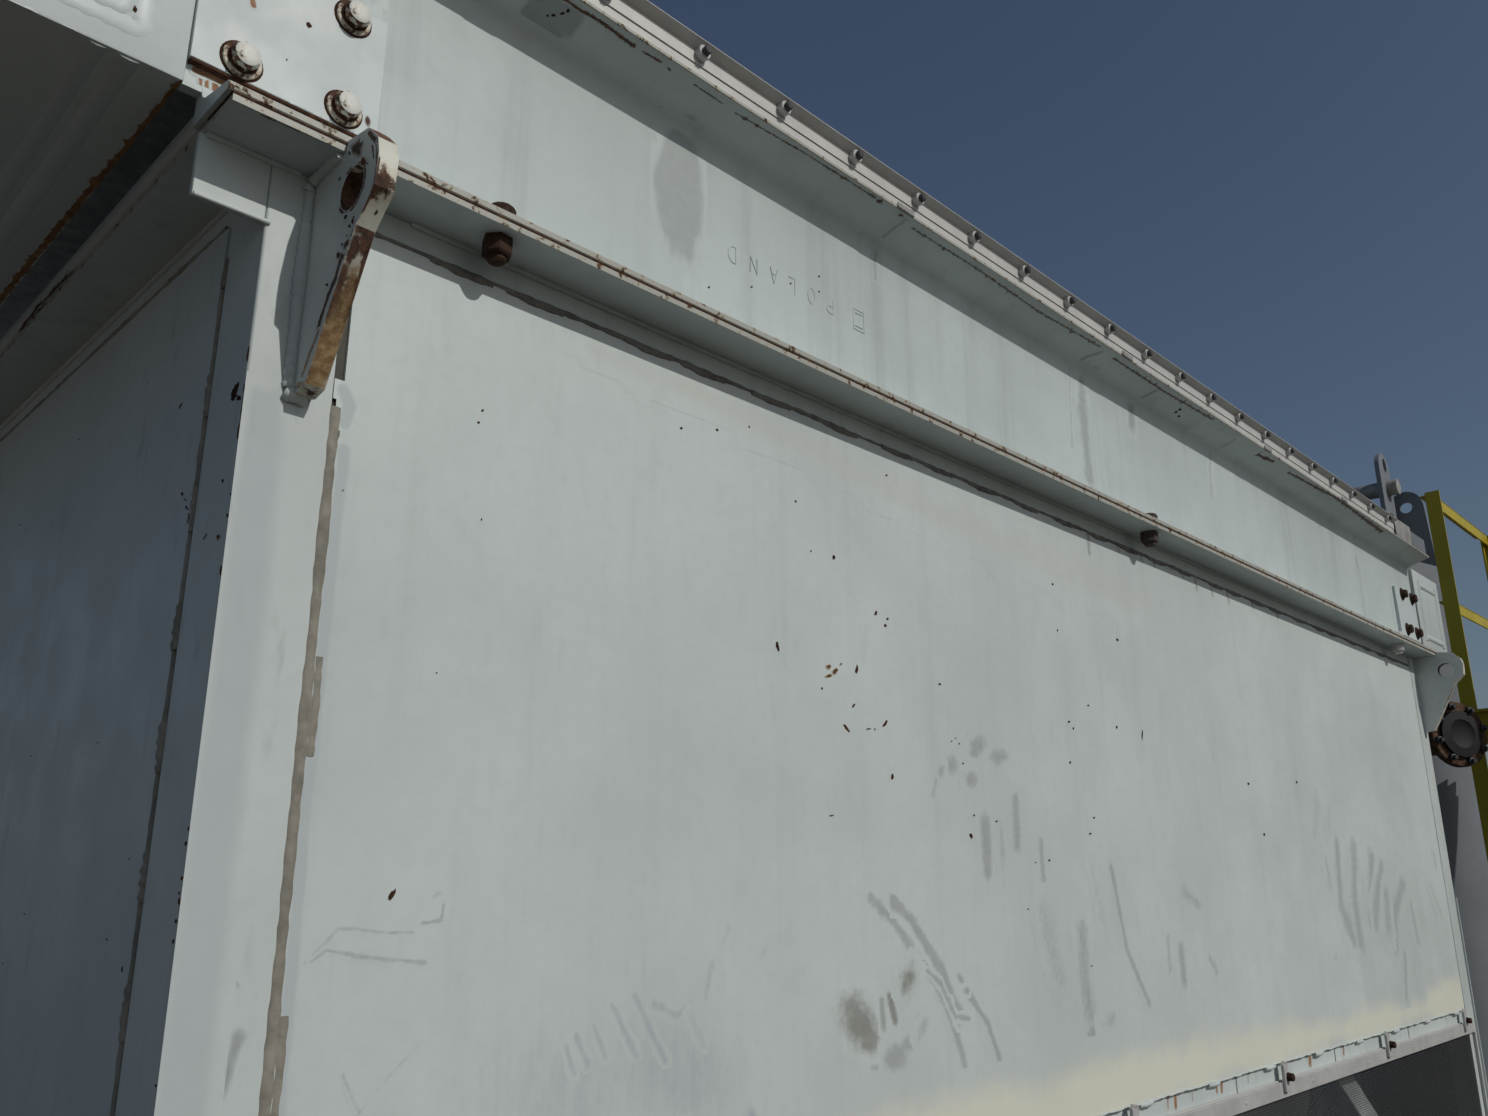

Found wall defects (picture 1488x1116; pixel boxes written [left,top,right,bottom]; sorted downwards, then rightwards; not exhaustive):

rust [0,57,395,392]